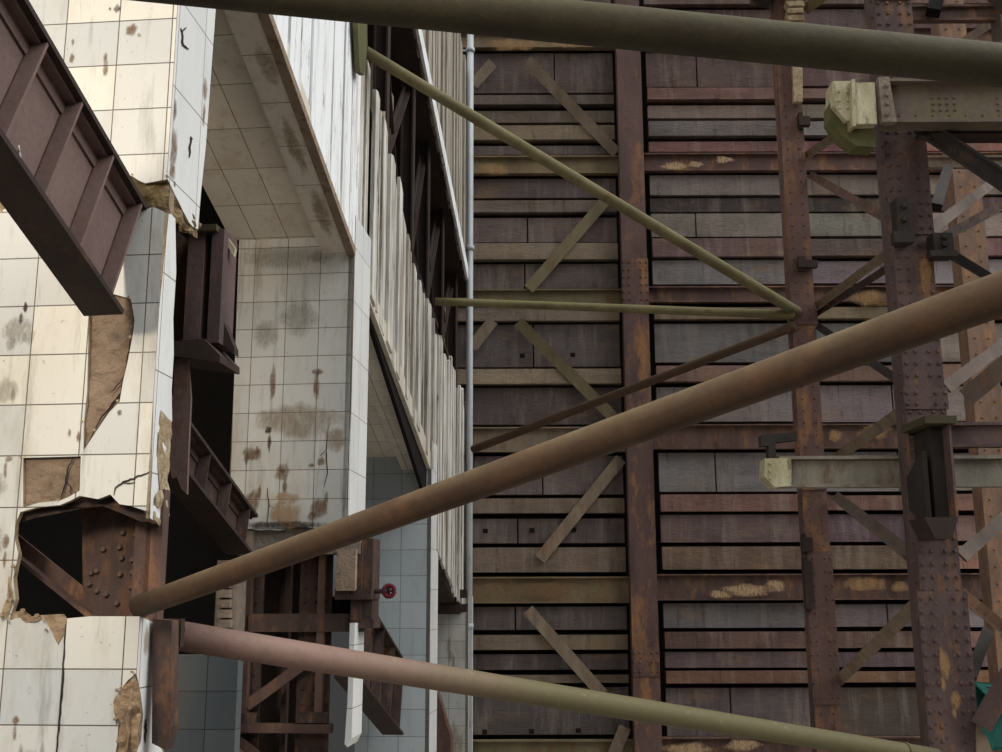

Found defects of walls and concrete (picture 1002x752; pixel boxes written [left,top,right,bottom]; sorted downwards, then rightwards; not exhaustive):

spalling [131,173,202,238]
spalling [80,295,135,446]
spalling [20,411,172,526]
spalling [0,564,67,644]
spalling [113,670,141,752]
corrosion [940,651,959,716]